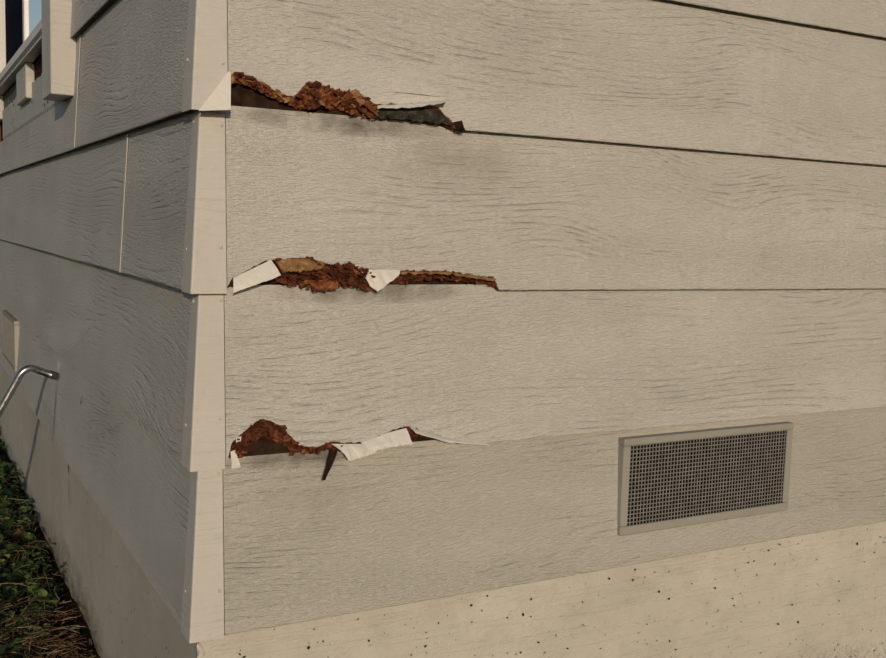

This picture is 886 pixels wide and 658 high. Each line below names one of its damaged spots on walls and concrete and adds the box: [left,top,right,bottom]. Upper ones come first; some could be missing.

peeling [377,100,446,109]
peeling [233,260,281,293]
peeling [362,269,400,292]
peeling [230,437,241,469]
peeling [332,427,490,461]